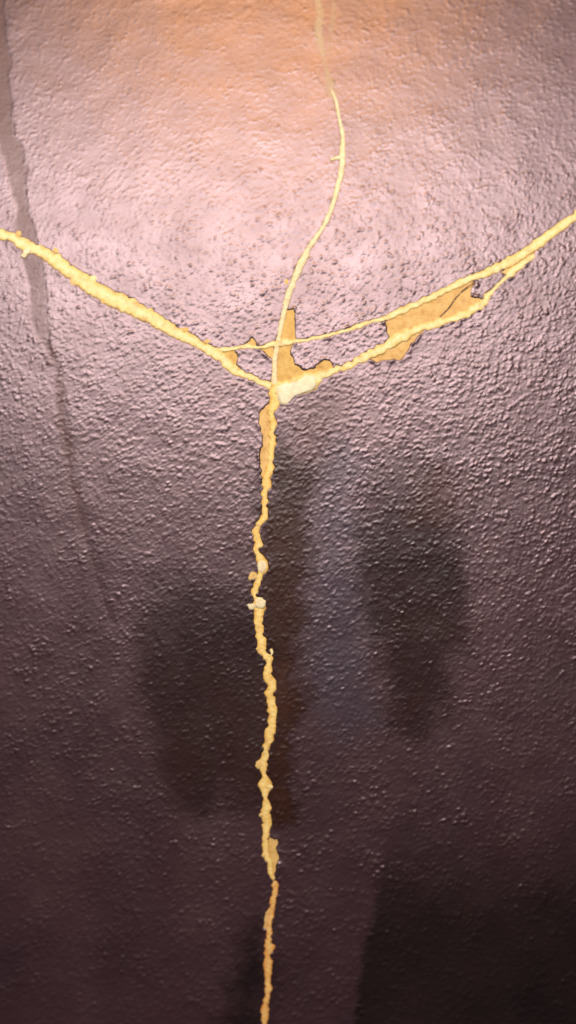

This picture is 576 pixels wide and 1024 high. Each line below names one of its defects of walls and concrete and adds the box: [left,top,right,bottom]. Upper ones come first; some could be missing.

peeling [247,309,333,382]
peeling [370,281,481,362]
crack [0,88,576,880]
leakage [367,514,463,730]
leakage [146,626,277,804]
crack [260,881,279,1024]